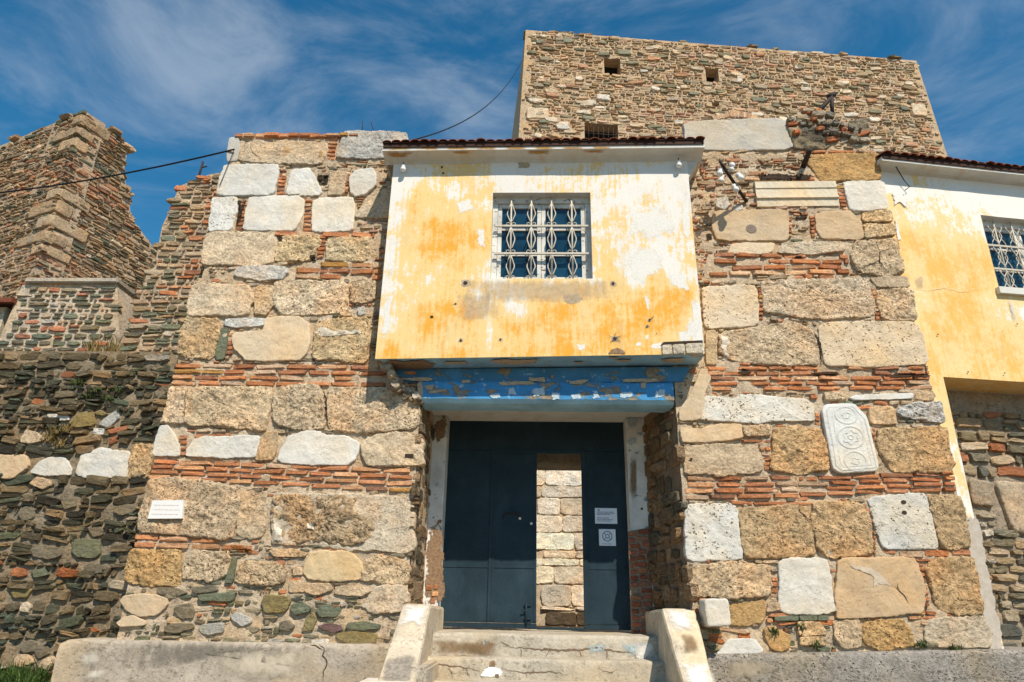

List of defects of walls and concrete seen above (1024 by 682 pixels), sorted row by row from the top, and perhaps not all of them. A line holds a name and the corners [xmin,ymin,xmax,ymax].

peeling [608,192,704,363]
spalling [375,360,467,408]
peeling [490,359,600,400]
peeling [620,378,665,398]
spalling [402,516,445,625]
crack [312,644,328,677]
crack [501,641,653,677]